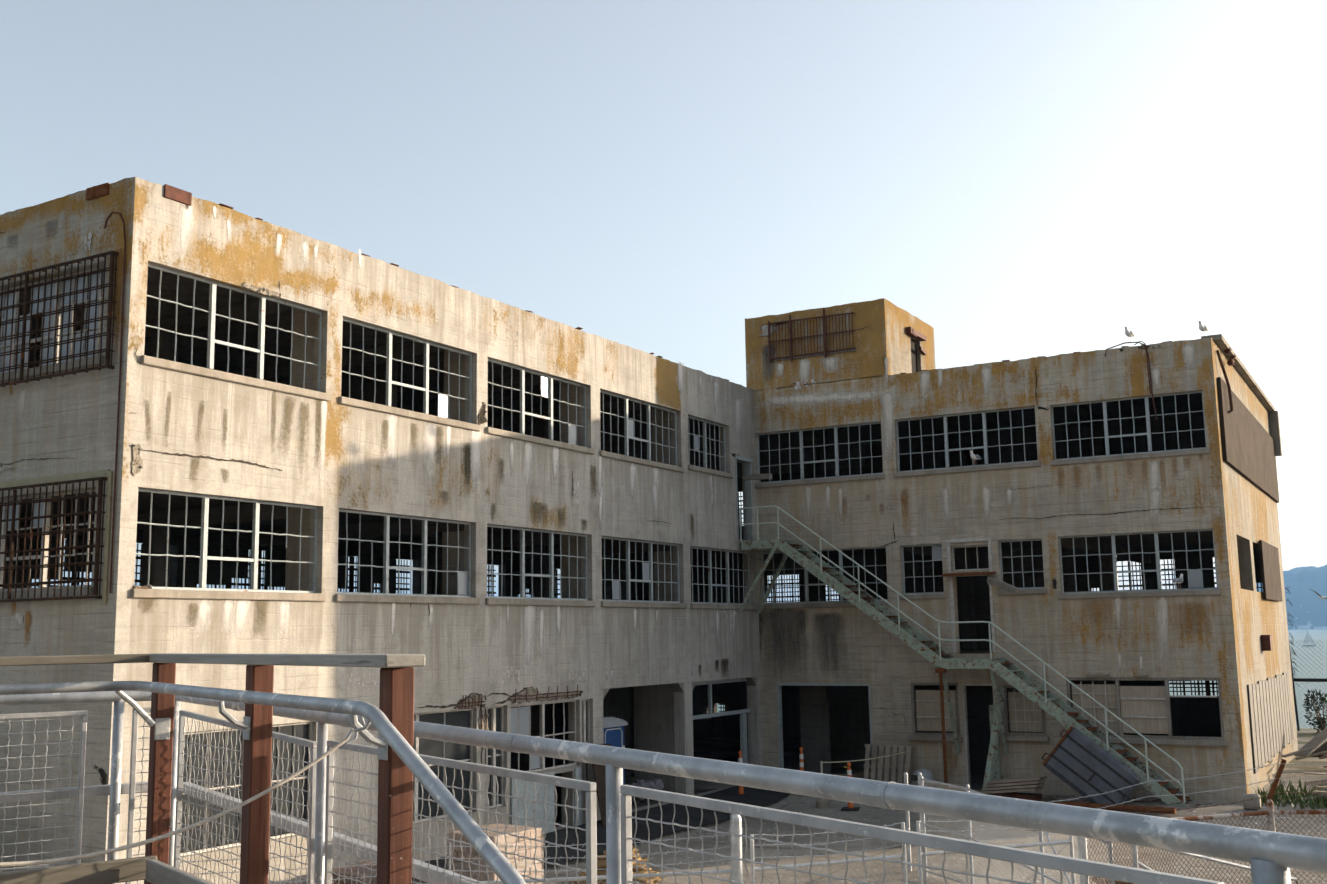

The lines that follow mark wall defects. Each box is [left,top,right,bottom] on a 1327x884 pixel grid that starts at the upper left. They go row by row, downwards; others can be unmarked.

damp [302,242,318,263]
damp [1183,344,1194,366]
damp [921,368,942,396]
damp [771,357,893,456]
crack [144,450,283,471]
damp [1150,460,1161,519]
damp [1157,596,1168,658]